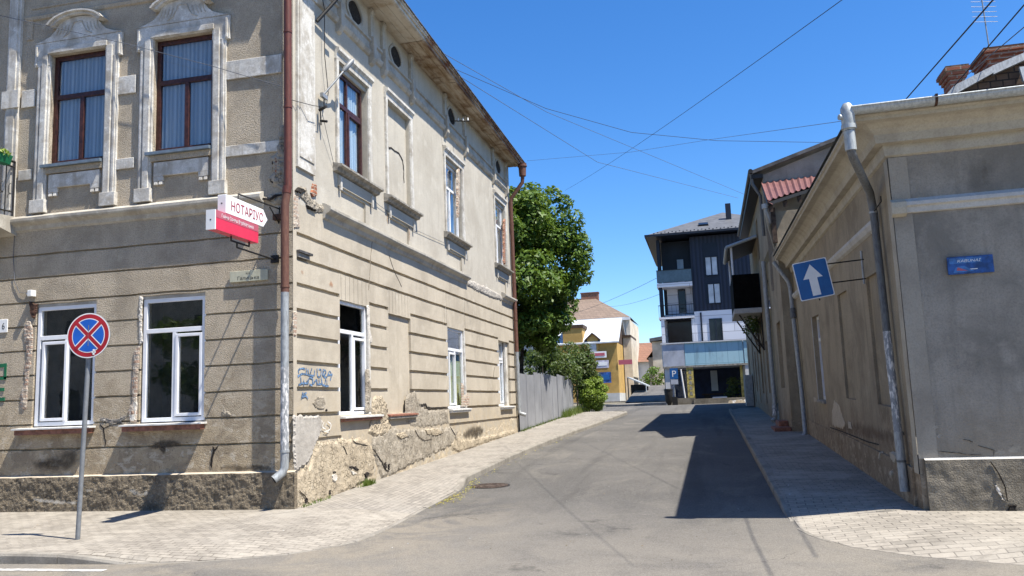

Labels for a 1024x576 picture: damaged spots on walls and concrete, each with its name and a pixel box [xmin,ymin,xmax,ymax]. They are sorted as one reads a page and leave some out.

spalling [267,125,324,228]
spalling [20,301,38,409]
spalling [128,296,143,423]
spalling [297,391,515,508]
crack [940,439,1008,501]